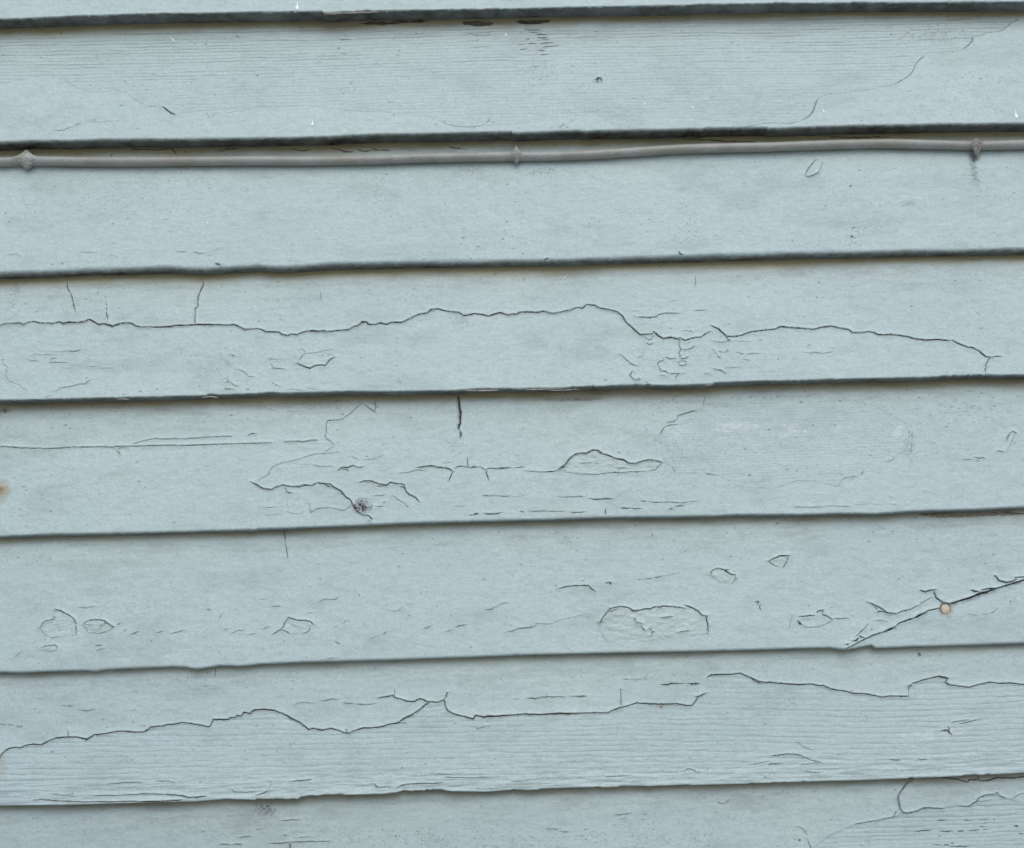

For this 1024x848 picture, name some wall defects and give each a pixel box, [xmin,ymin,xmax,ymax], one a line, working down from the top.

peeling [298,350,334,369]
crack [253,396,692,520]
peeling [40,610,113,652]
peeling [600,606,708,643]
crack [846,577,1024,649]
peeling [0,674,1024,800]
peeling [814,795,1024,848]